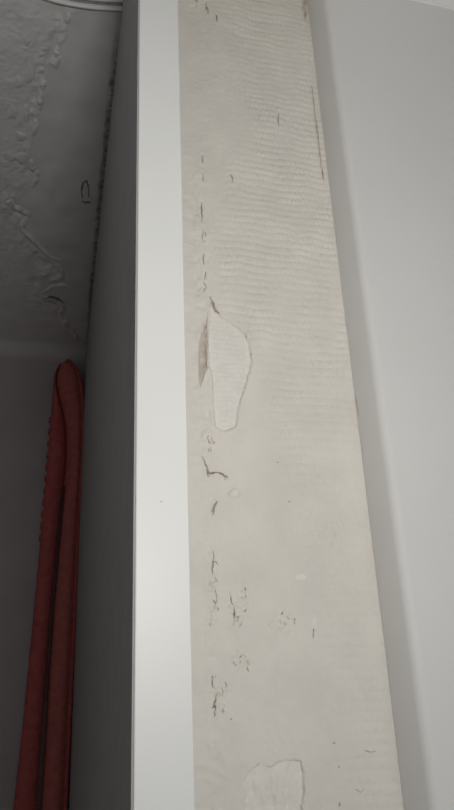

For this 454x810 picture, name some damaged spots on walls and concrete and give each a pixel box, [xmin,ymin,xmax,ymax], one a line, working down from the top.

peeling [199,311,209,387]